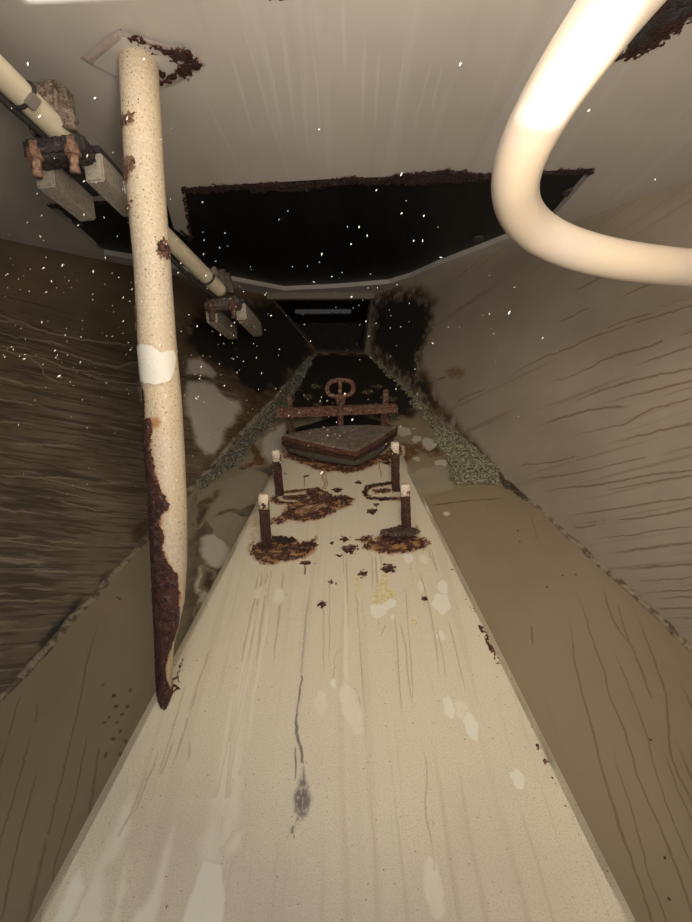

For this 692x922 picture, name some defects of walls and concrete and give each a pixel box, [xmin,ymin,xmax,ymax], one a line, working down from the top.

corrosion [128,389,183,711]
corrosion [244,440,445,576]
corrosion [36,593,88,649]